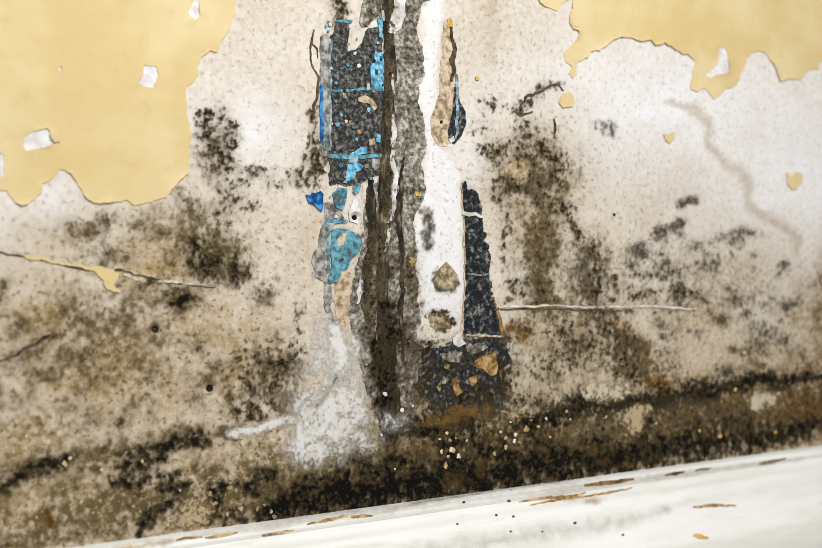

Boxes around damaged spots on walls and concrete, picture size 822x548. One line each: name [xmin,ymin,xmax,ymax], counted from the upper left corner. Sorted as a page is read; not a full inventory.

peeling [539,0,822,100]
peeling [0,0,236,206]
peeling [559,92,575,108]
spalling [306,0,519,436]
crack [0,251,217,293]
crack [495,303,698,311]
damp [0,120,822,548]
spalling [438,431,468,469]
spalling [492,417,548,456]